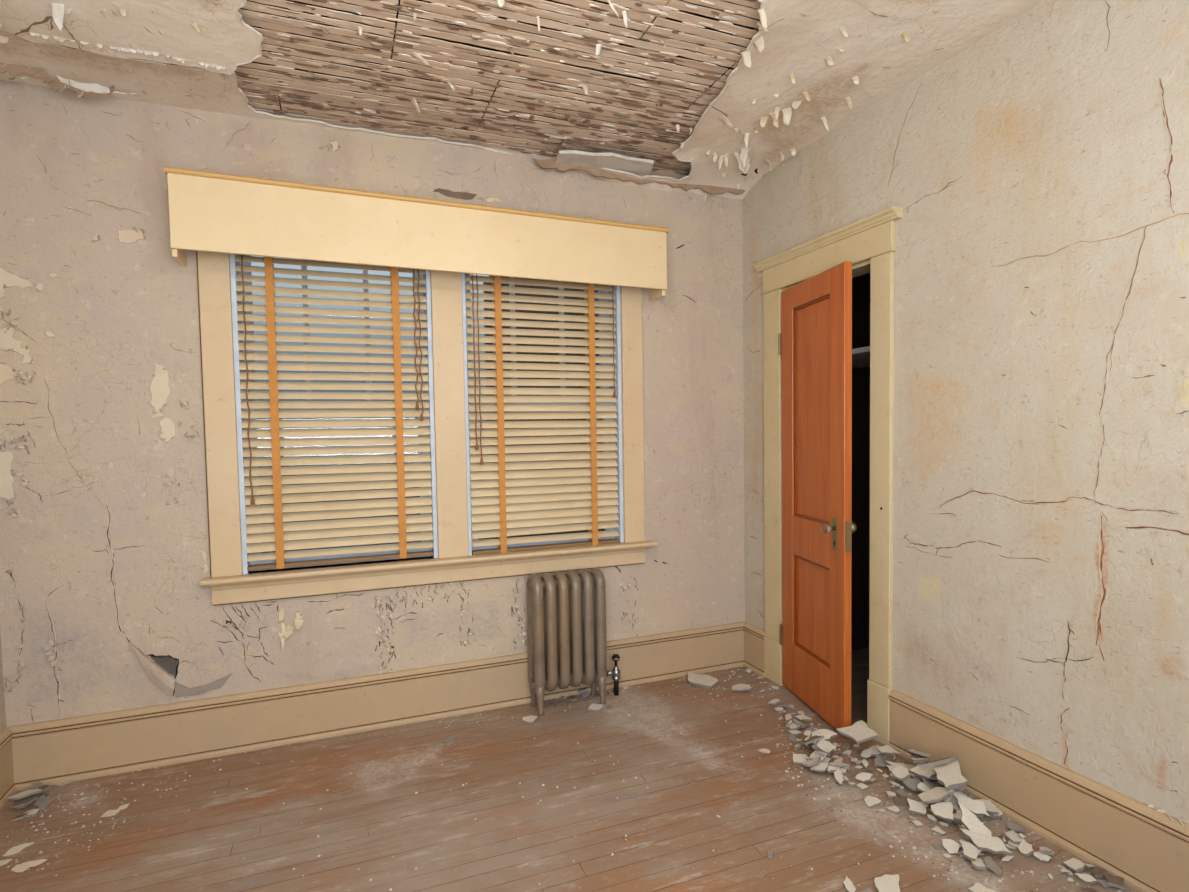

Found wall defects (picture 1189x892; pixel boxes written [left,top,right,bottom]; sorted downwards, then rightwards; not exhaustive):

peeling [0,63,147,97]
flaking render [230,0,810,203]
crack [888,84,962,211]
peeling [0,325,34,385]
peeling [149,362,176,443]
crack [931,78,1189,767]
peeling [0,450,18,518]
crack [0,375,150,657]
crack [904,534,1049,562]
crack [4,568,72,723]
crack [211,601,278,682]
peeling [278,606,305,651]